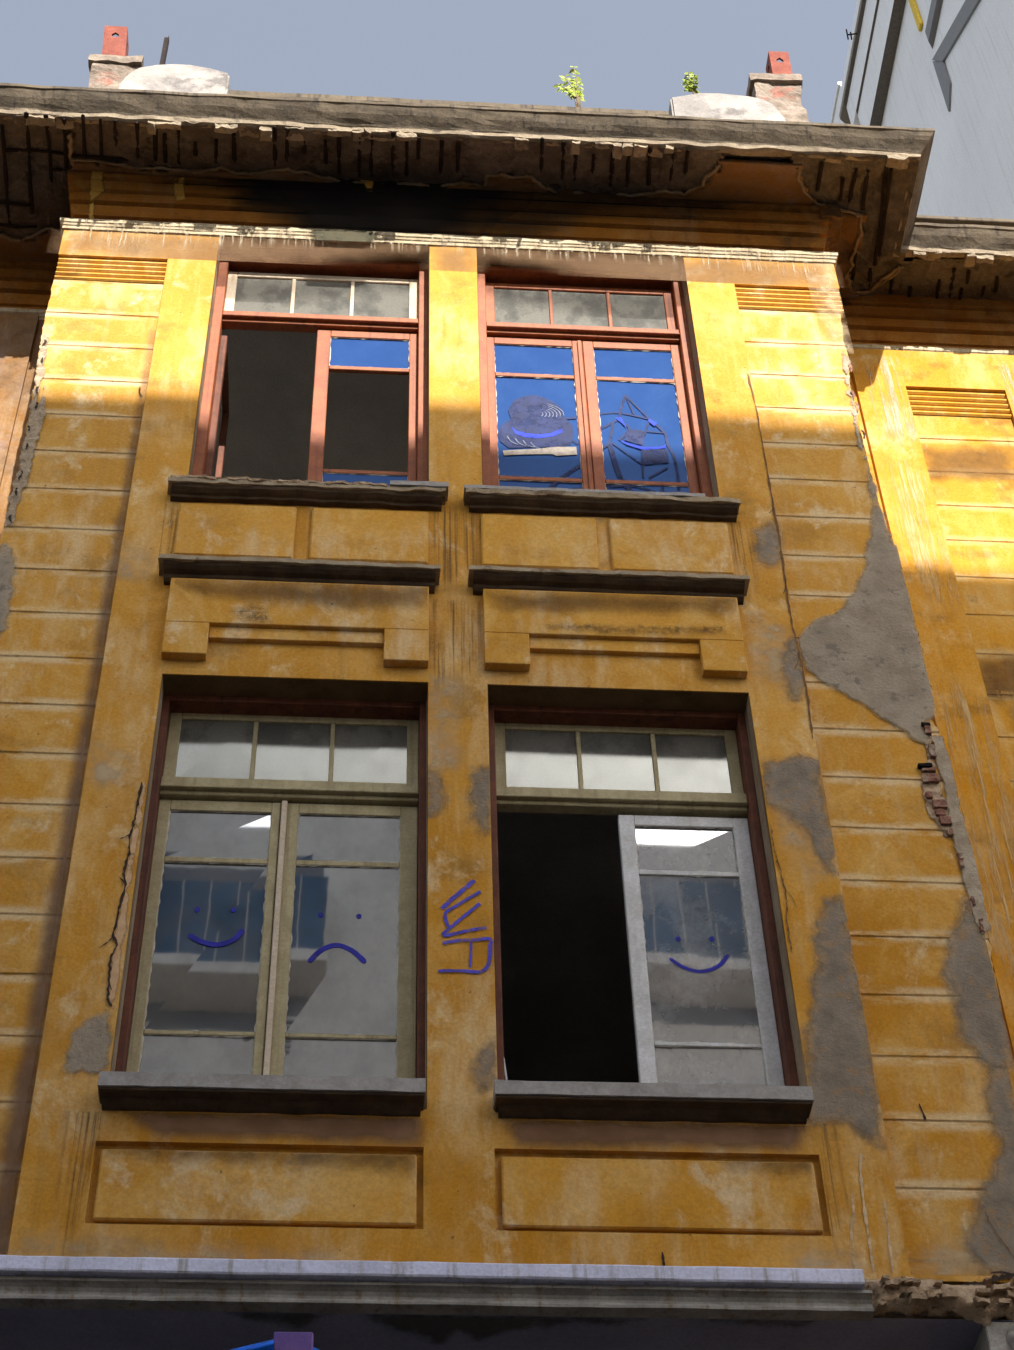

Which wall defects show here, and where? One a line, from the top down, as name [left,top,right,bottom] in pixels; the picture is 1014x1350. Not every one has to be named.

spalling [5,334,49,526]
flaking render [0,543,16,632]
flaking render [64,782,146,1074]
crack [99,782,143,1007]
flaking render [761,352,1014,1276]